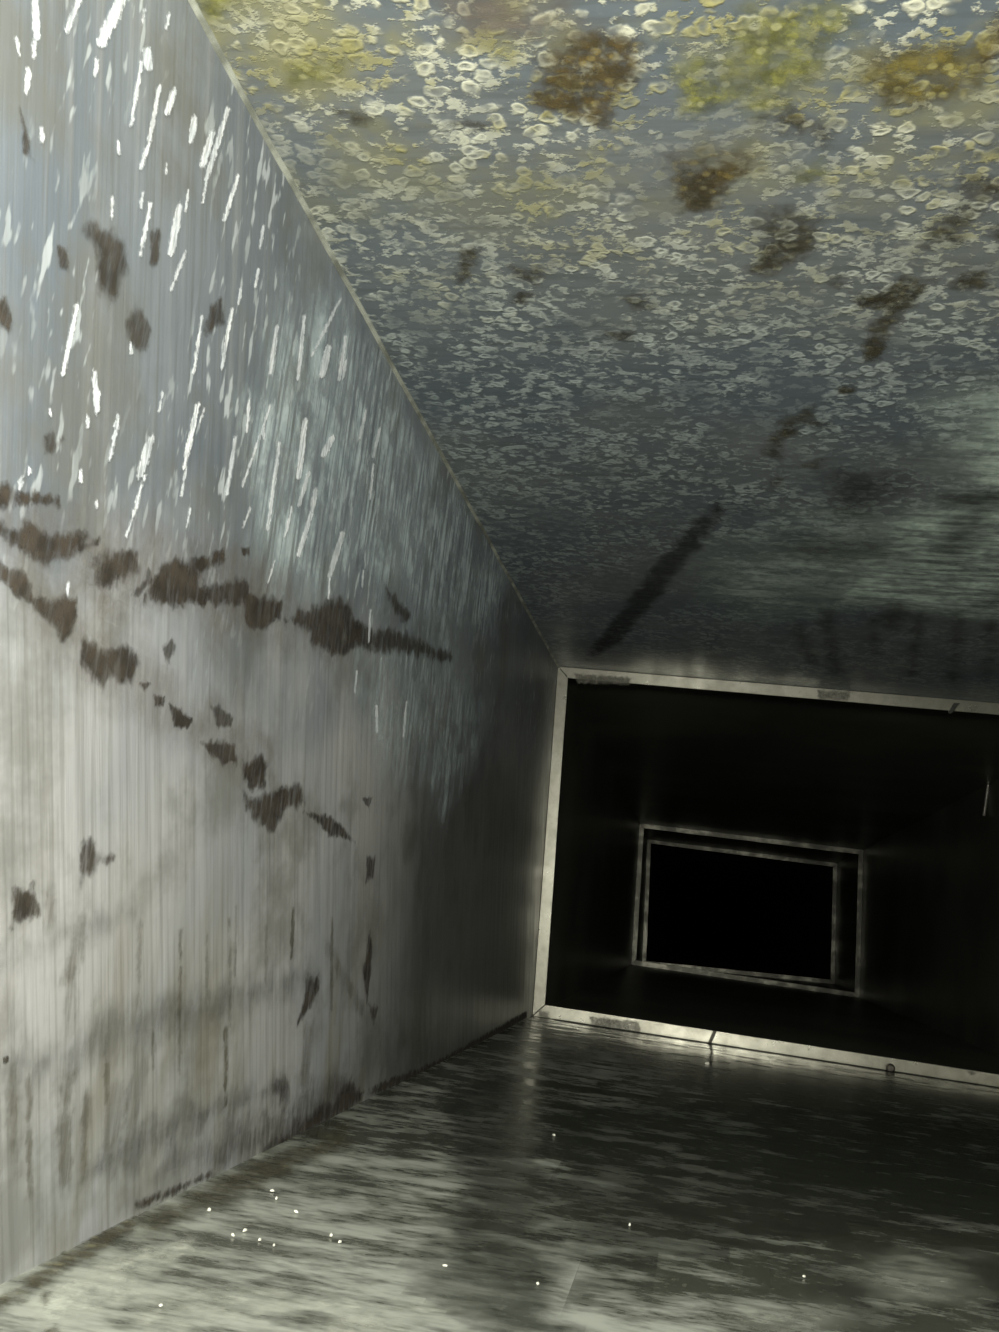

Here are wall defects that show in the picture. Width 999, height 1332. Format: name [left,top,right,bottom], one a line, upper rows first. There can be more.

leakage [534,34,635,126]
leakage [736,15,812,86]
leakage [866,38,999,102]